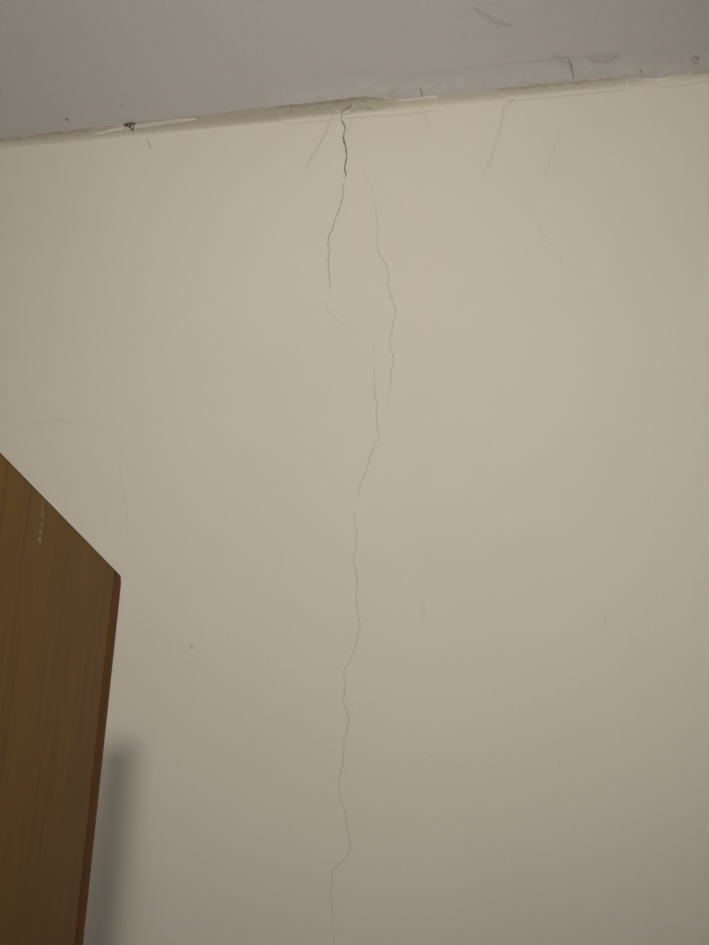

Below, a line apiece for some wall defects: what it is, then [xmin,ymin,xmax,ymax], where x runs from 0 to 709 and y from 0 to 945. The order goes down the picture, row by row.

crack [305,101,397,945]